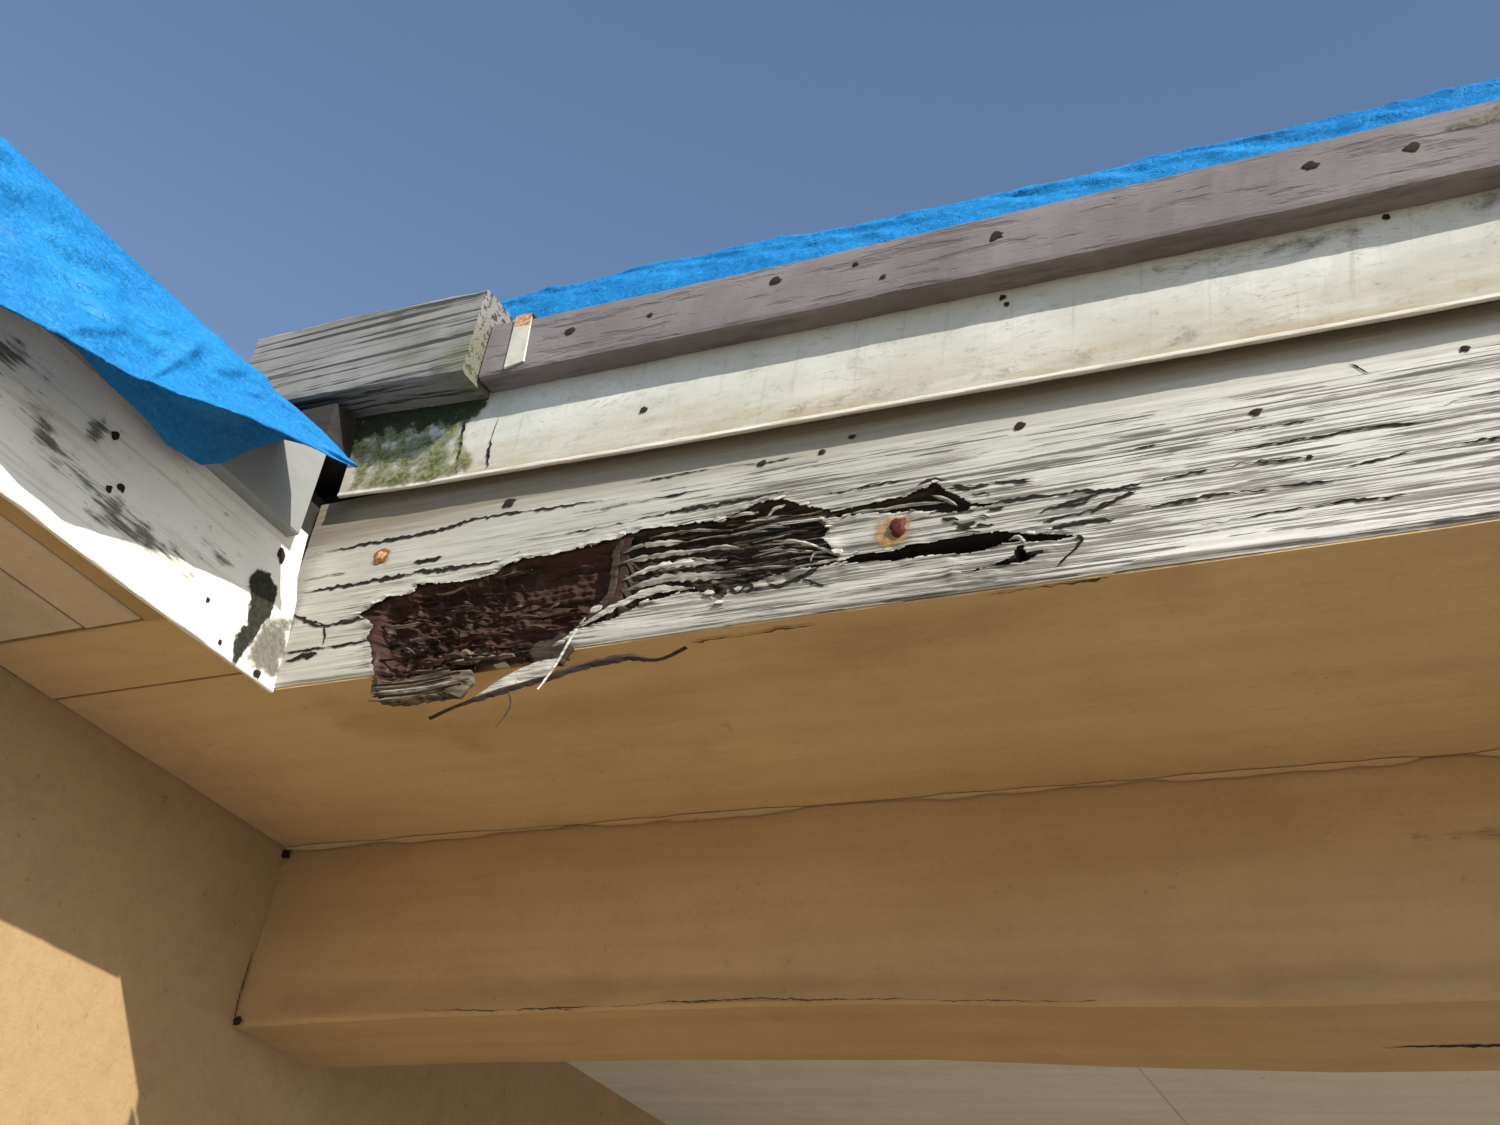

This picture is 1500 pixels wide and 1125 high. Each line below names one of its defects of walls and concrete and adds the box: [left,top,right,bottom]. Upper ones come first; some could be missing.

damp [0,338,194,576]
spalling [573,495,860,630]
crack [284,355,1500,663]
crack [1395,1042,1500,1050]